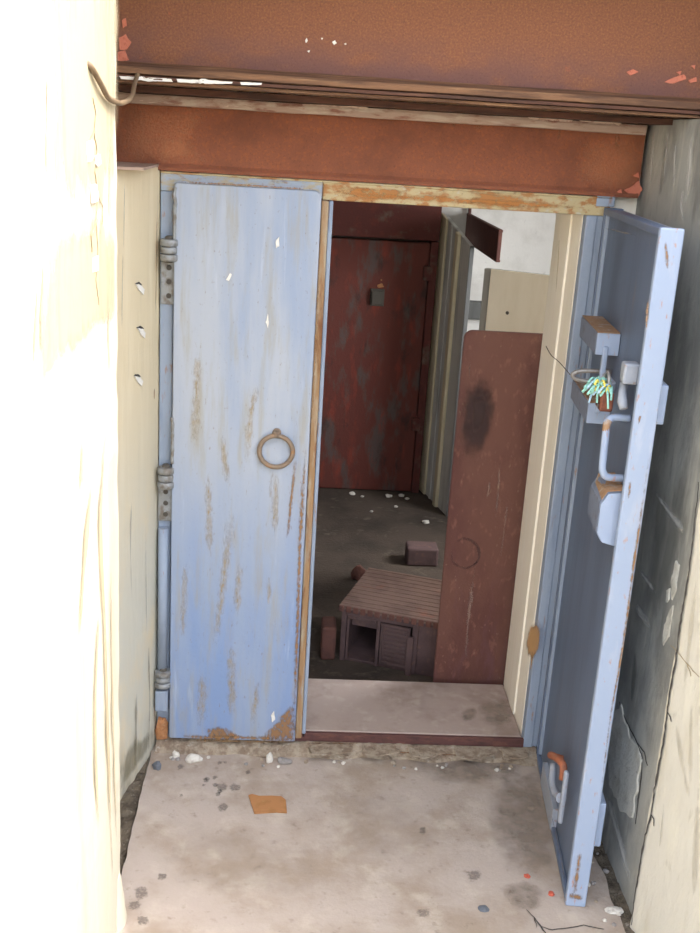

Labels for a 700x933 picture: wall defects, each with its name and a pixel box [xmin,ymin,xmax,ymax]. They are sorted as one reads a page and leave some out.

peeling [118,18,131,61]
peeling [665,65,697,84]
rust [190,182,301,190]
peeling [617,172,642,196]
rust [311,291,319,418]
rust [288,470,305,685]
rust [610,510,642,718]
rust [191,697,296,743]
spalling [608,704,643,818]
crack [526,909,602,933]